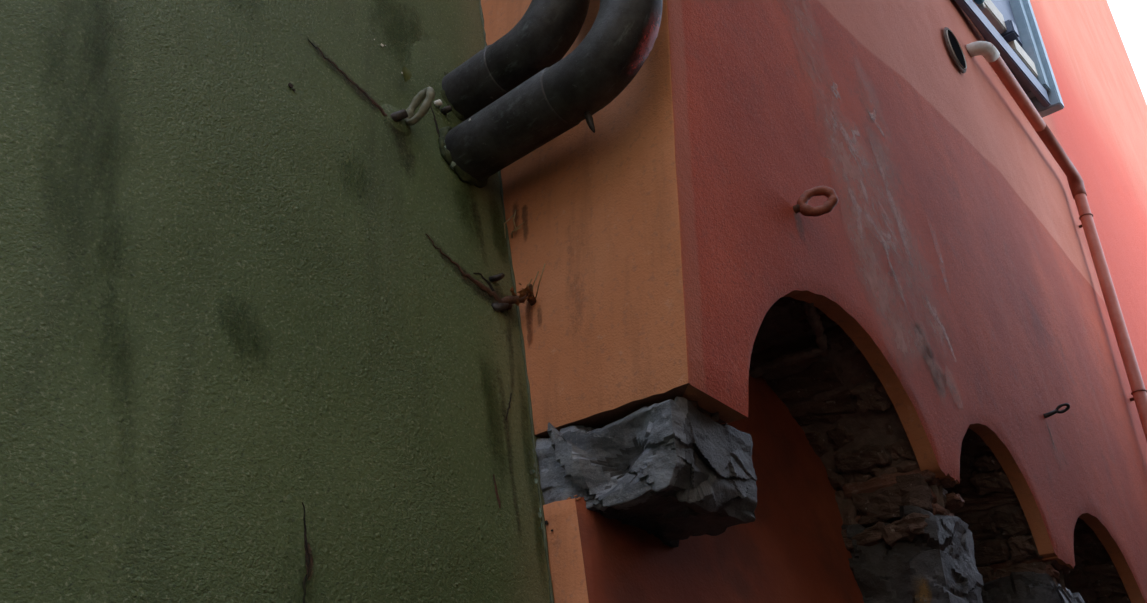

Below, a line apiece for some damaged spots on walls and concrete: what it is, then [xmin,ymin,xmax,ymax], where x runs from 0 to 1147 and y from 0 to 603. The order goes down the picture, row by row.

crack [302,502,313,603]